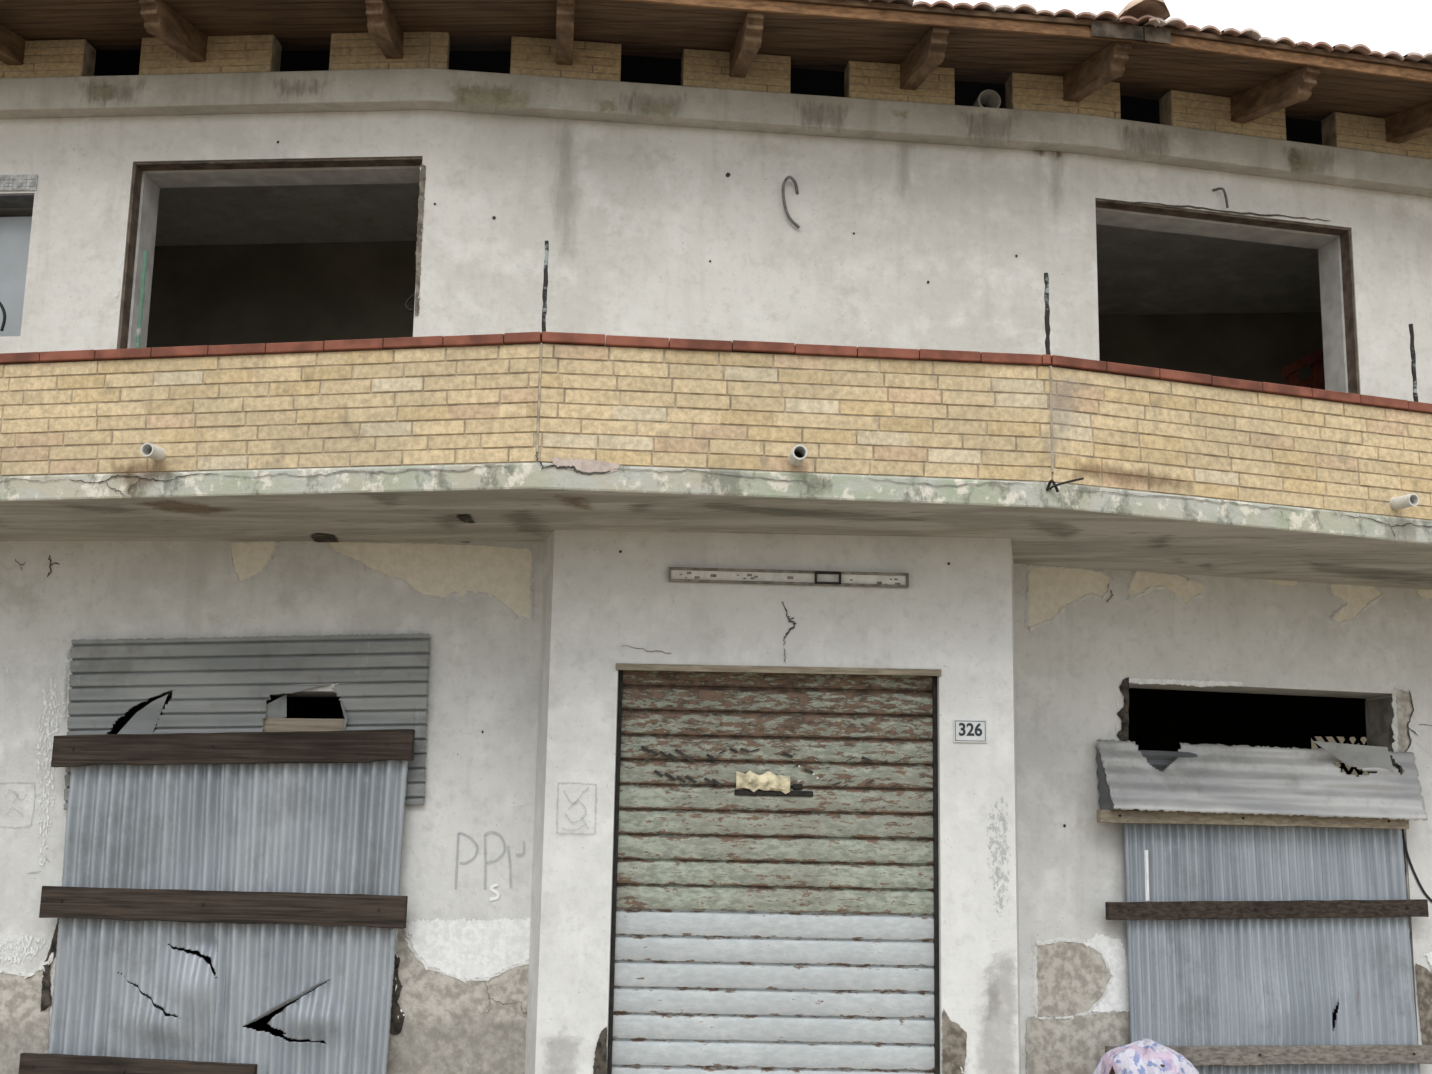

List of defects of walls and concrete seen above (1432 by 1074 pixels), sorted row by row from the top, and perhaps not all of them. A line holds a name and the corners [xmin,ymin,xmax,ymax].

crack [0,454,827,496]
peeling [225,541,281,584]
peeling [310,534,536,623]
crack [783,606,797,662]
peeling [1024,564,1209,632]
peeling [1327,583,1383,628]
peeling [1116,677,1244,741]
flaking render [1391,685,1418,762]
flaking render [0,918,59,1074]
flaking render [387,917,531,1074]
flaking render [1025,932,1130,1074]
flaking render [1416,950,1432,1045]